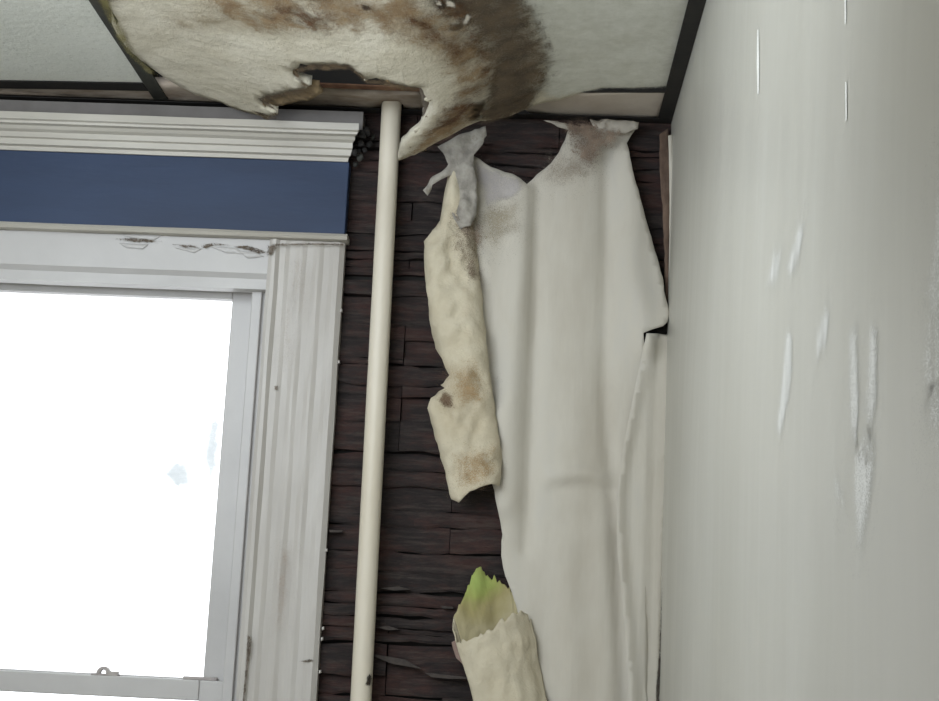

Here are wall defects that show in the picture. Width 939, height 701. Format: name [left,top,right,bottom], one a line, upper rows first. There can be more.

spalling [262,79,323,107]
water stain [96,0,562,157]
spalling [352,126,375,167]